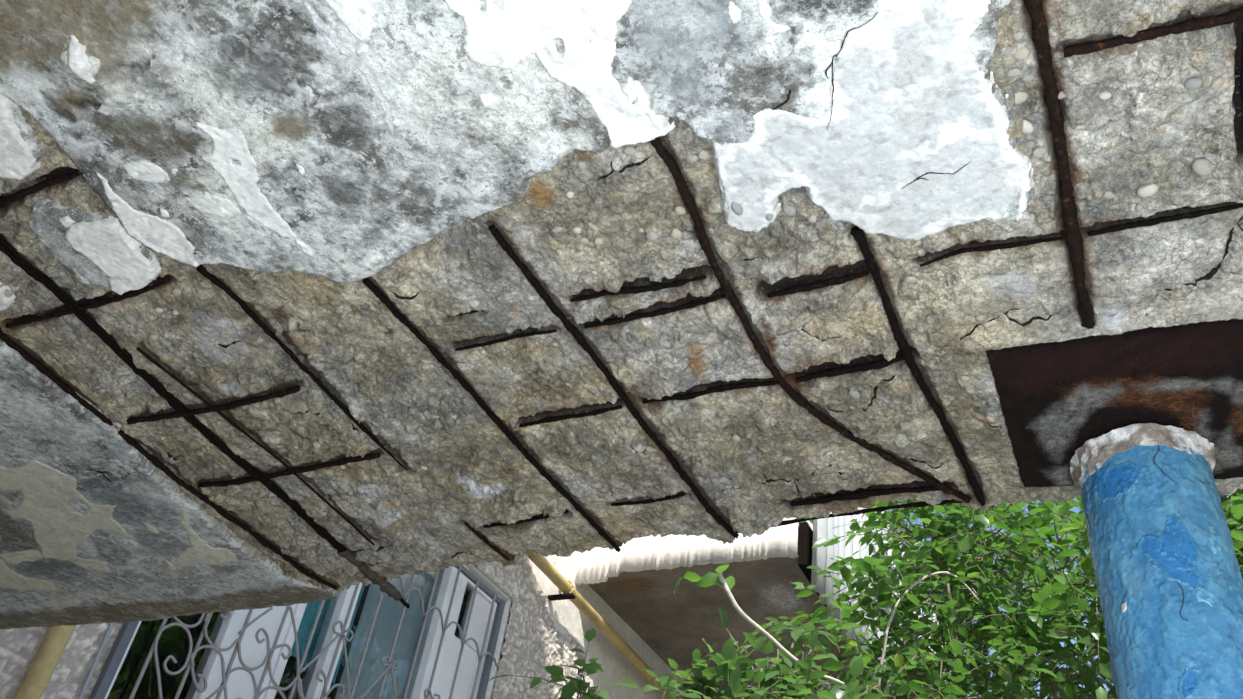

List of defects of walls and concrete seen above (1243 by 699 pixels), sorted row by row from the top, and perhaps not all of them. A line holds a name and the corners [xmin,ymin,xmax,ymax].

crack [825,13,877,130]
crack [902,161,971,189]
spalling [368,0,1243,547]
crack [1156,216,1243,296]
crack [960,309,1058,341]
spalling [0,94,684,699]
corrosion [1066,377,1208,437]
peeling [1136,514,1222,606]